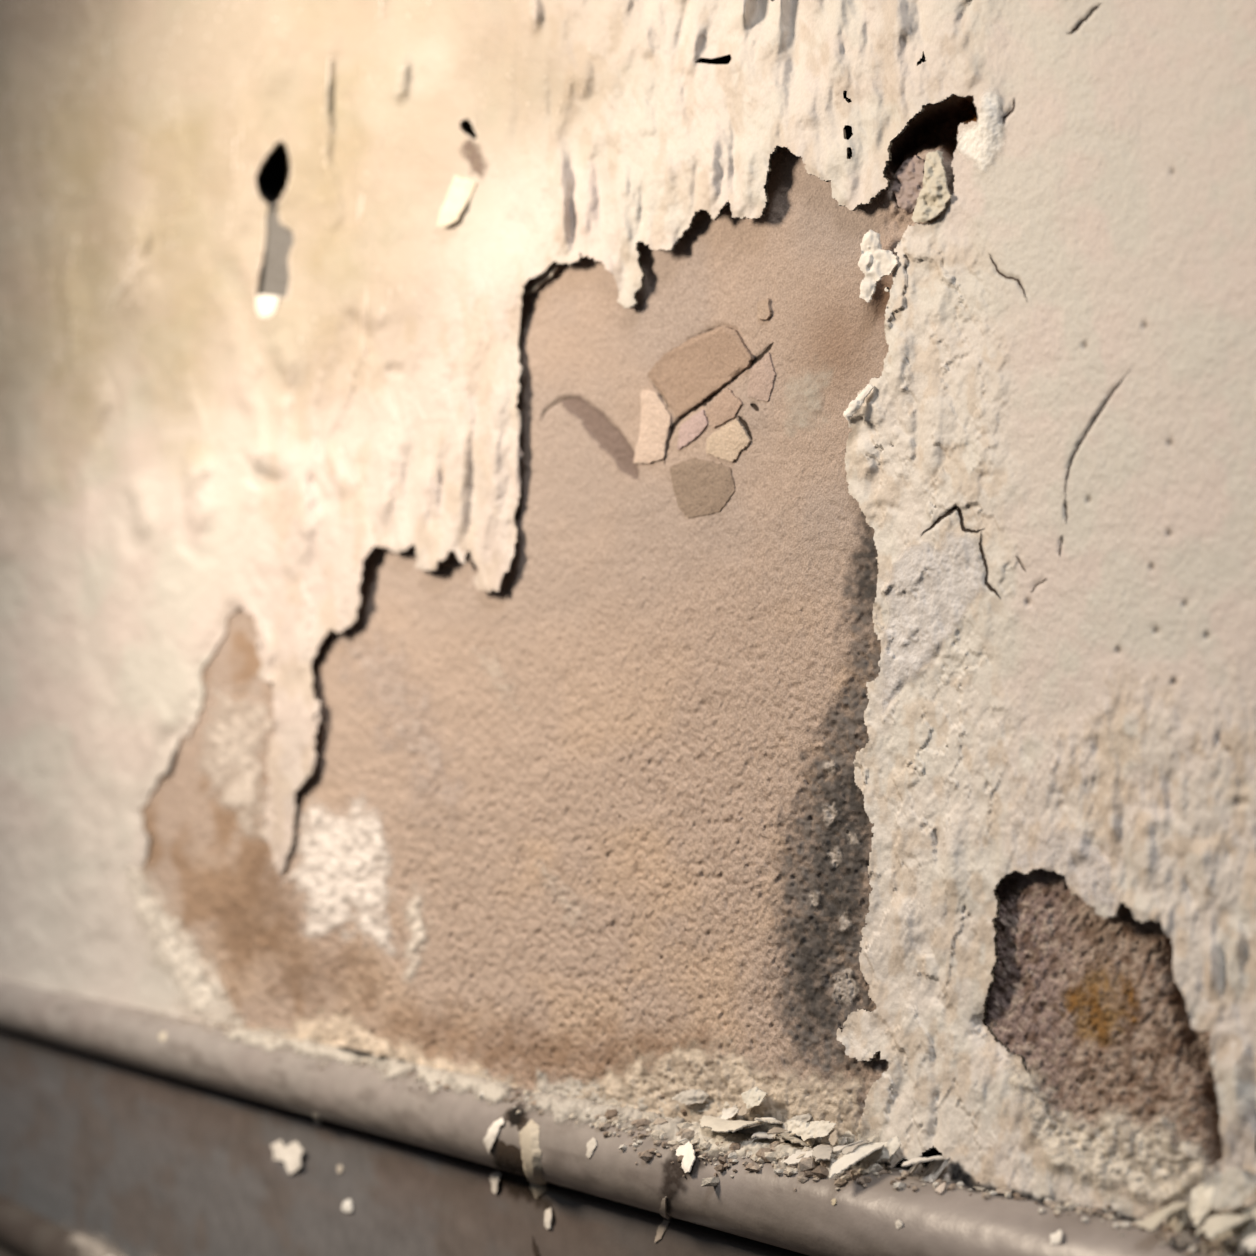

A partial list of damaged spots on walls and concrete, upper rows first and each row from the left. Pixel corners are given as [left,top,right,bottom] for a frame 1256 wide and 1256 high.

spalling [140,95,1256,1187]
crack [922,506,1001,600]
crack [1016,371,1128,592]
leakage [203,690,272,838]
leakage [287,800,426,979]
leakage [527,512,887,1176]
spalling [483,1103,553,1229]